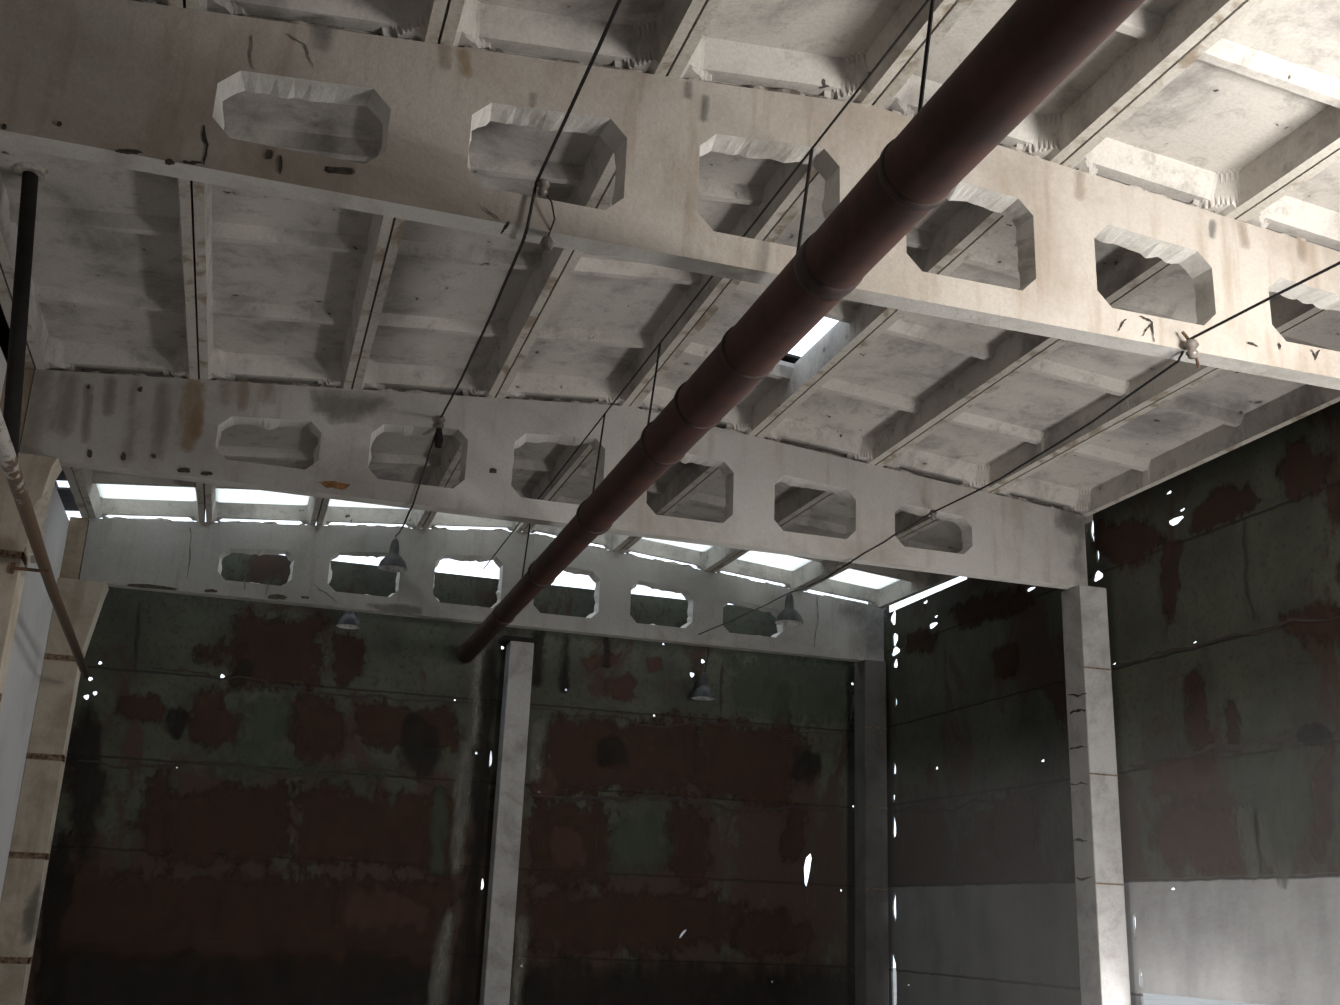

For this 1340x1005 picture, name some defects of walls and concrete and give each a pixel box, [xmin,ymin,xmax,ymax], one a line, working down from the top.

rust [1092,483,1262,625]
rust [905,628,938,655]
rust [950,585,1035,630]
rust [115,686,244,752]
rust [352,697,463,776]
rust [530,671,699,804]